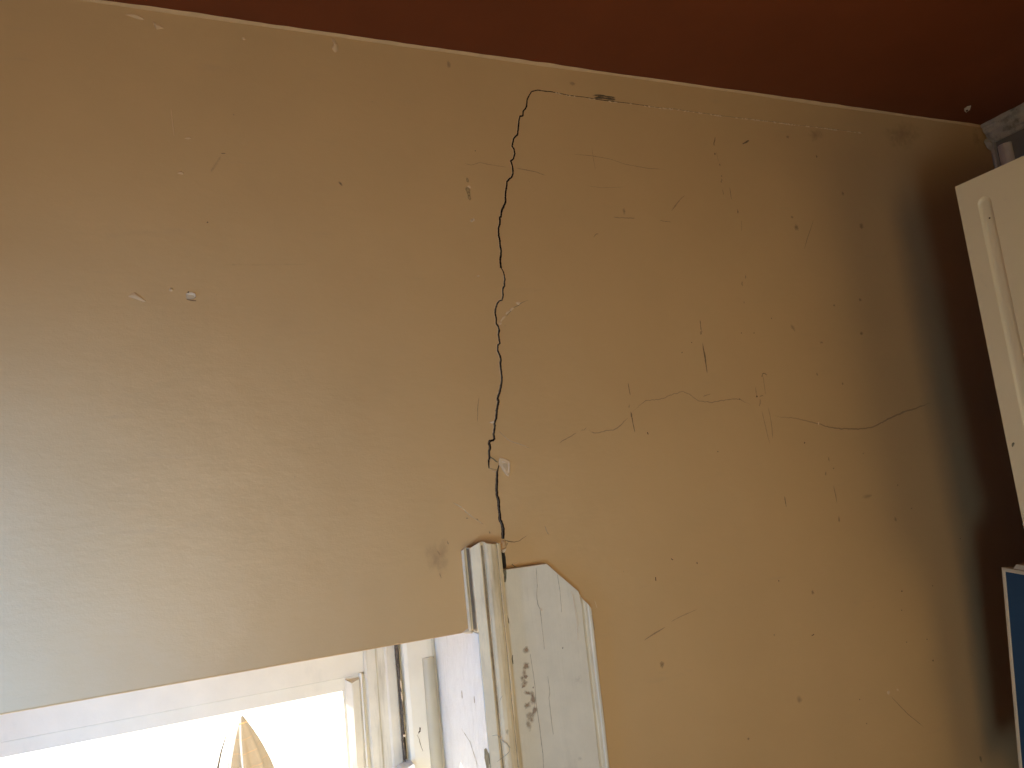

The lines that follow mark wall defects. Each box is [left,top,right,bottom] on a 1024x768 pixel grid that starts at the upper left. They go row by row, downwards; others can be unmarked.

crack [488,90,861,544]